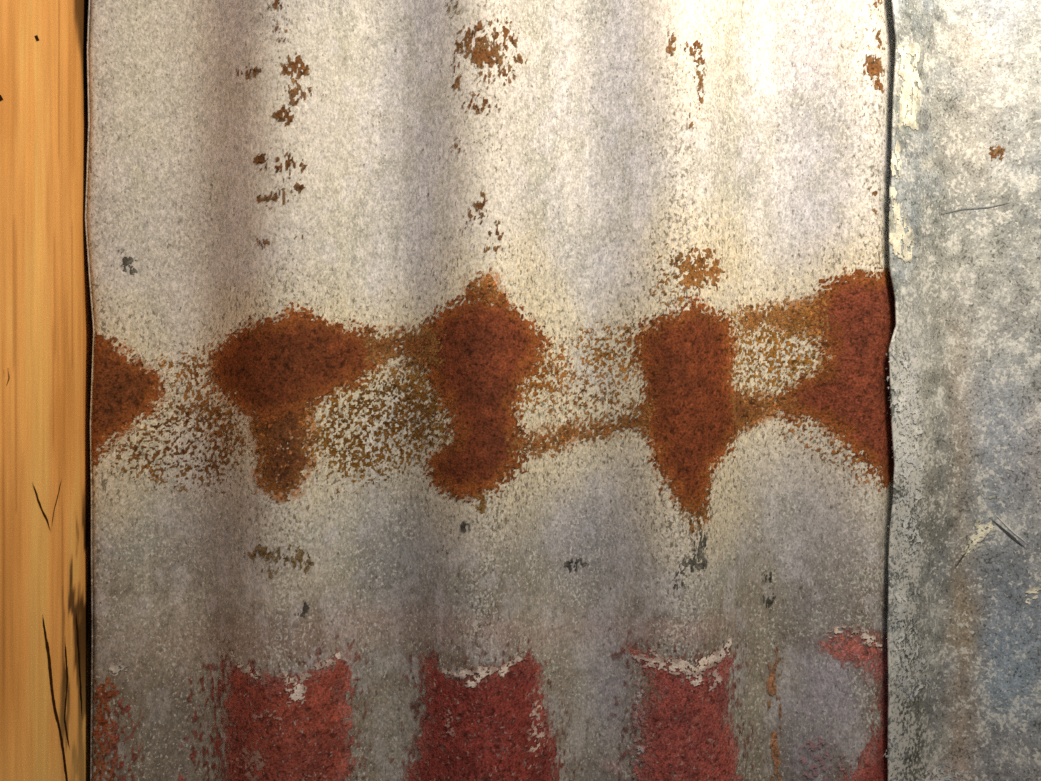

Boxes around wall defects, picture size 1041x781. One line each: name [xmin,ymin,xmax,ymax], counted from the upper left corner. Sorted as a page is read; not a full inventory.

corrosion [253,152,307,209]
corrosion [272,52,312,126]
corrosion [460,191,504,252]
corrosion [445,0,528,115]
corrosion [666,31,707,128]
corrosion [863,0,922,263]
corrosion [92,243,933,700]
peeling [97,685,144,781]
peeling [178,635,373,781]
peeling [390,639,583,781]
peeling [609,628,755,781]
peeling [793,625,888,781]